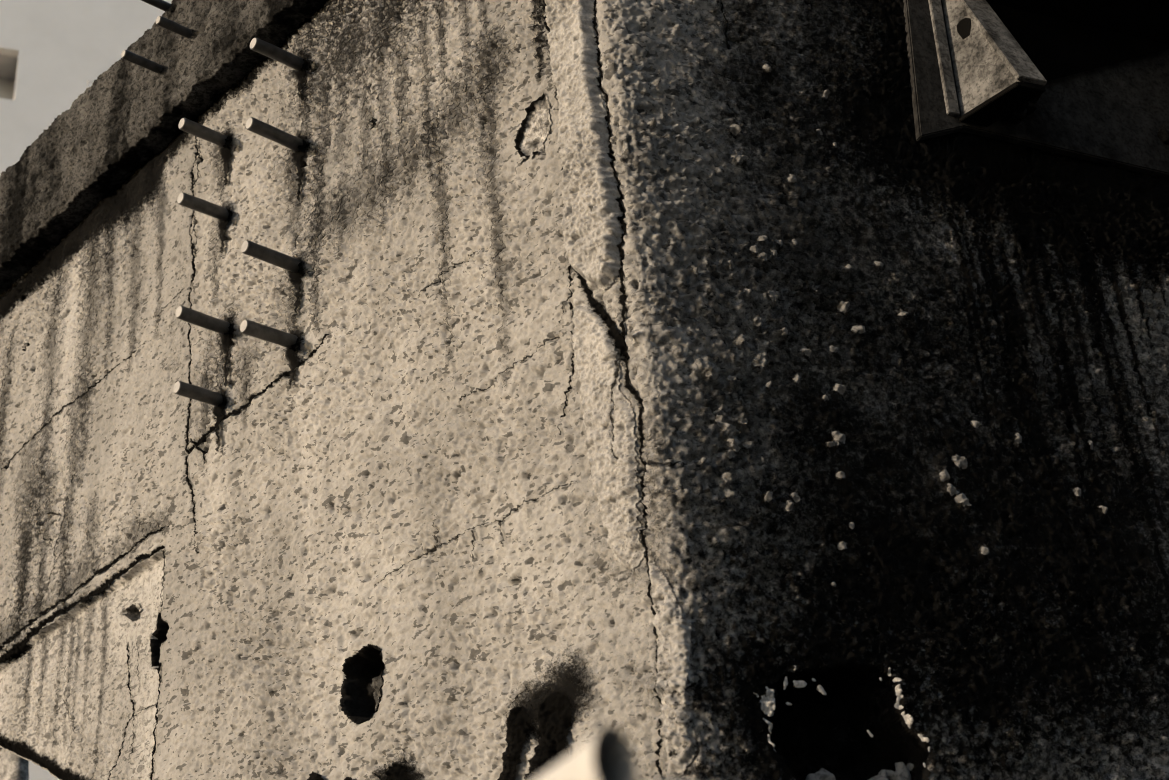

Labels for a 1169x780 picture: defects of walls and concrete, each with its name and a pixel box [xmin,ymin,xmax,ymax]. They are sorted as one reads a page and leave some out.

leakage [530,0,557,99]
crack [720,0,731,49]
crack [0,136,329,663]
leakage [0,0,509,719]
crack [459,0,687,780]
leakage [627,0,1169,780]
leakage [0,674,104,780]
crack [108,643,162,780]
spalling [147,612,169,670]
spalling [340,644,385,724]
peeling [753,666,826,752]
peeling [880,667,930,767]